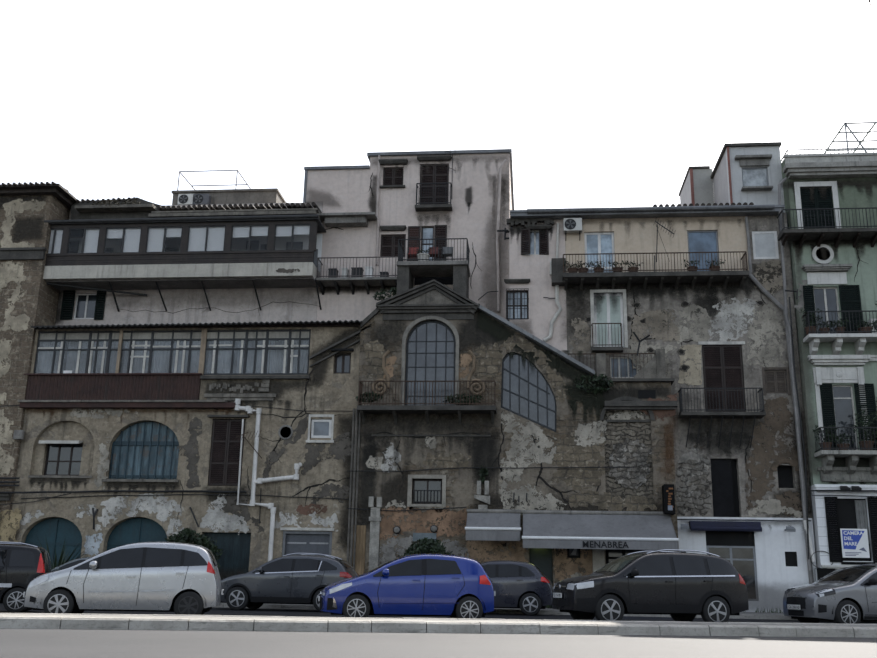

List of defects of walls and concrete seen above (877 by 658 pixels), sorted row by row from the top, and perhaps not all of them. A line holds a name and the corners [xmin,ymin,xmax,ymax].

peeling [0,199,46,248]
peeling [75,440,185,556]
peeling [200,483,350,535]
crack [261,371,348,462]
crack [292,477,350,504]
peeling [365,443,401,473]
damp [339,414,497,549]
crack [386,412,504,505]
crack [528,421,599,511]
spalling [499,260,788,517]